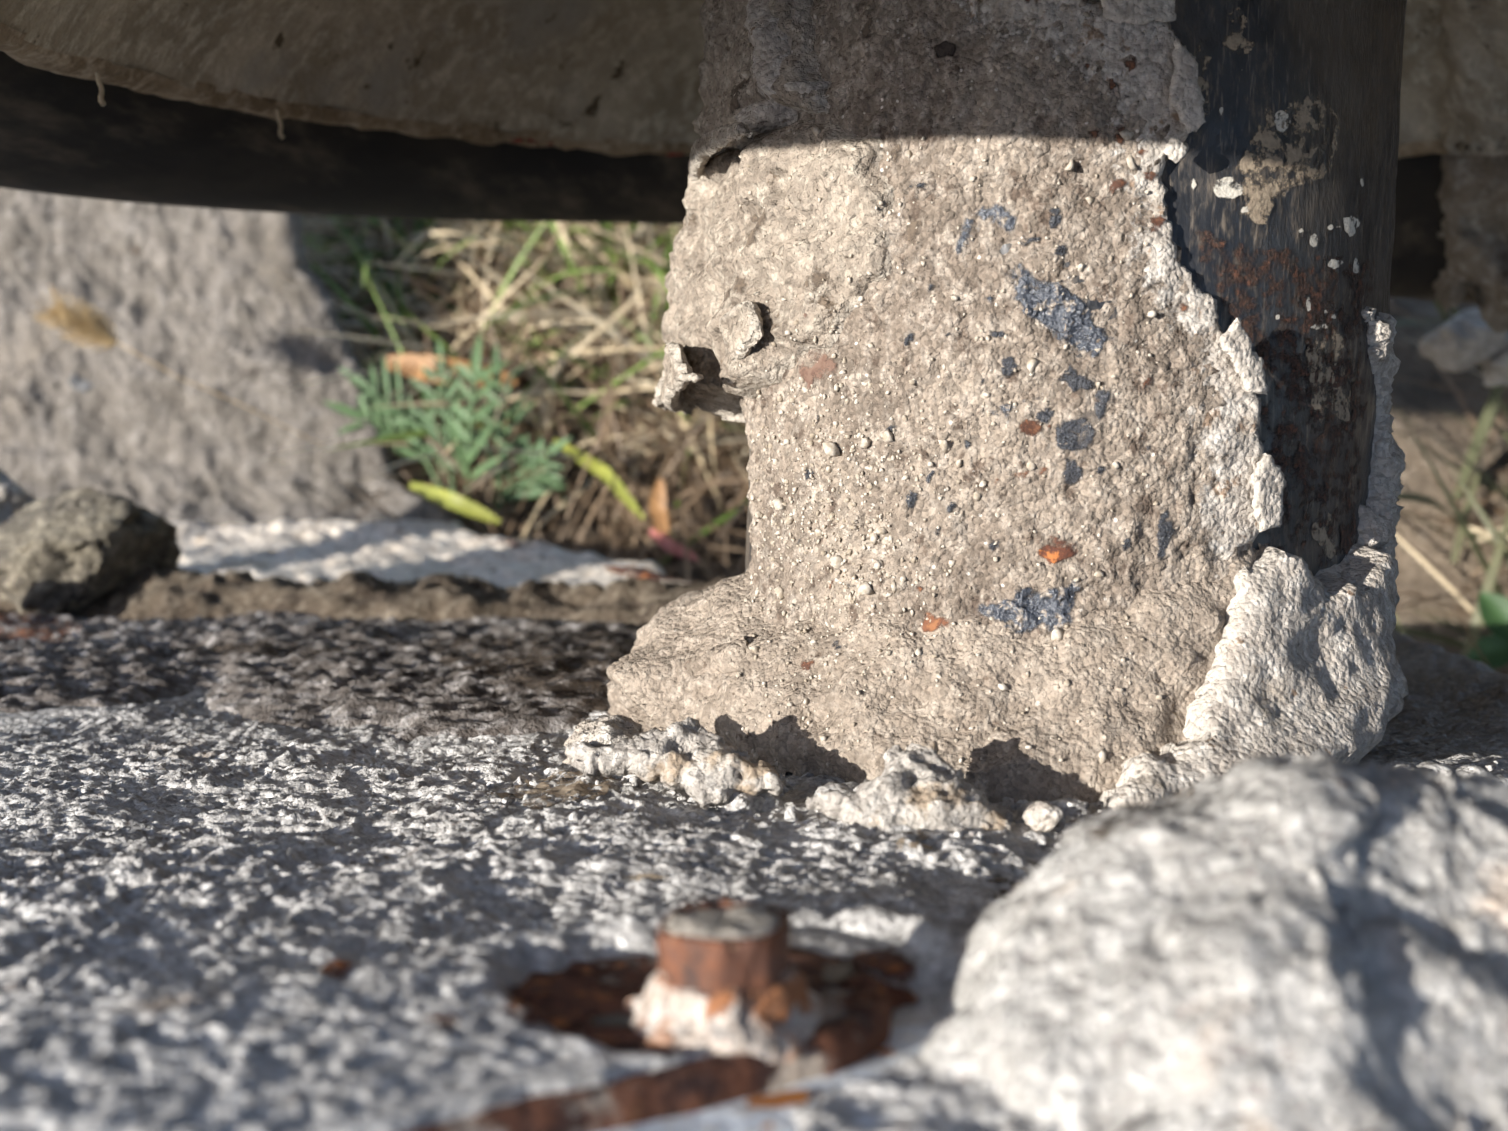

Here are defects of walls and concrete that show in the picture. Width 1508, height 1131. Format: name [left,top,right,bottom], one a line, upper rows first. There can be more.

spalling [934,41,956,57]
corrosion [1195,231,1374,566]
corrosion [504,956,658,1043]
corrosion [839,946,920,1015]
corrosion [746,1090,809,1130]